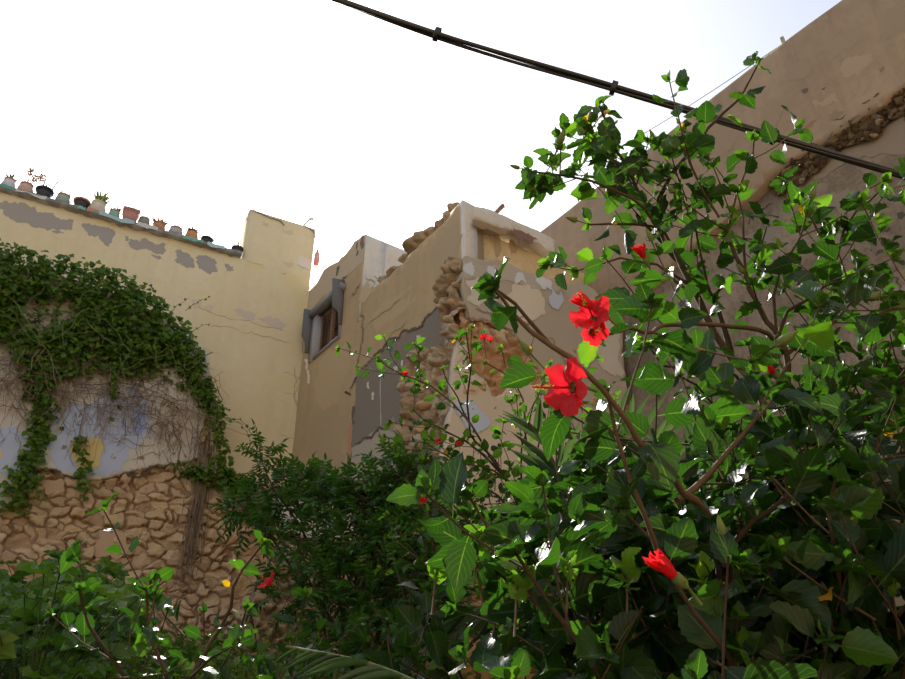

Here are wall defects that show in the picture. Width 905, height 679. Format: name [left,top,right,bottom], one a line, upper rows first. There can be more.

spalling [472,219,537,245]
crack [341,276,437,389]
crack [347,417,392,469]